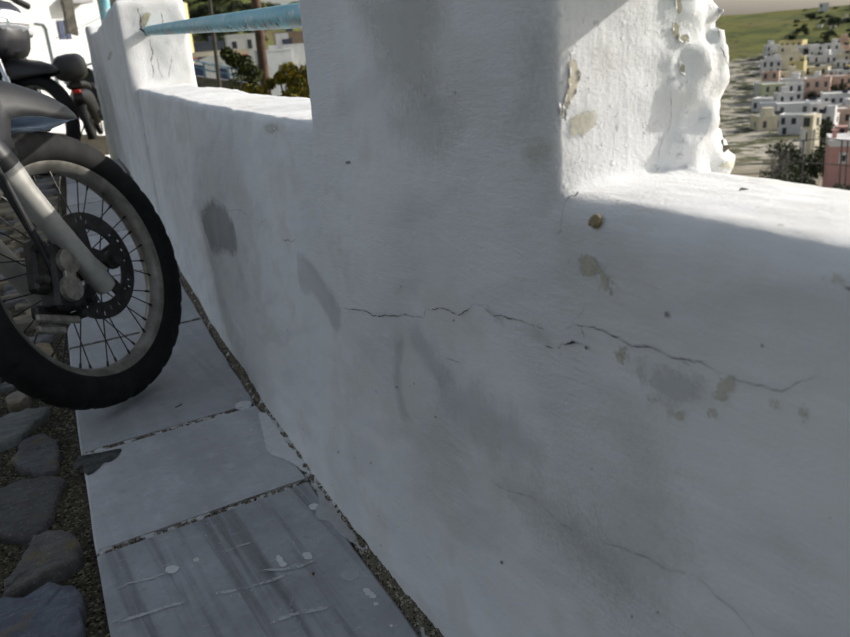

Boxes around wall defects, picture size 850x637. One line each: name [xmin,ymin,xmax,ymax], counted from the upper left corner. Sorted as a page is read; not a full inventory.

peeling [558,53,597,136]
crack [346,303,819,392]